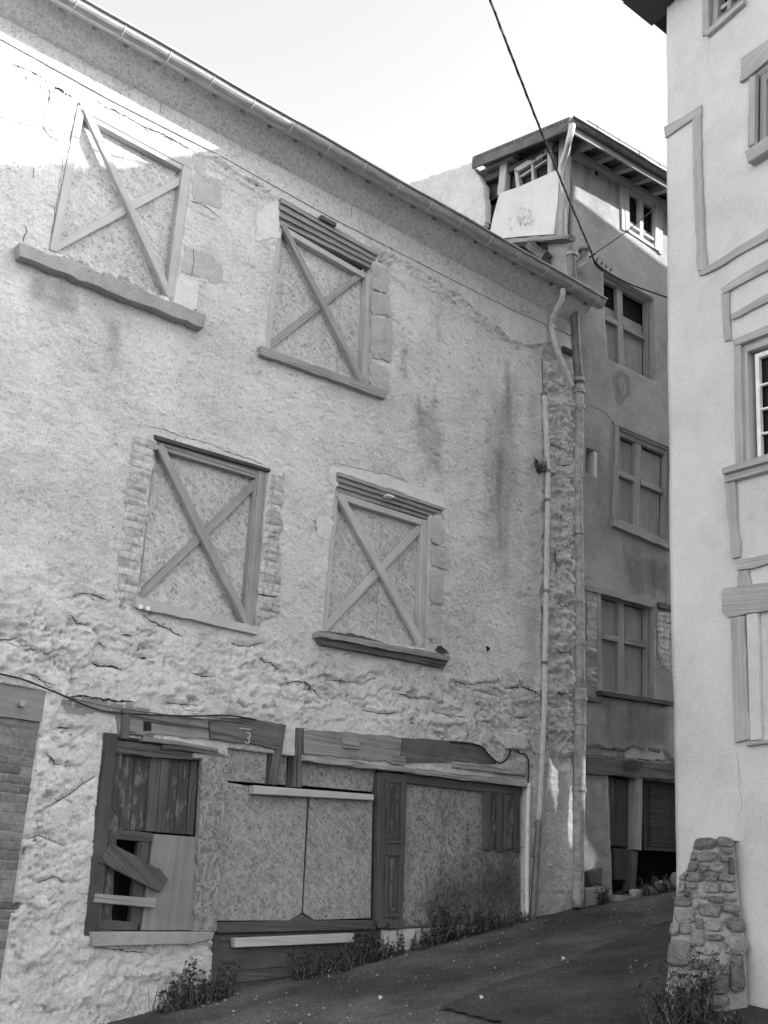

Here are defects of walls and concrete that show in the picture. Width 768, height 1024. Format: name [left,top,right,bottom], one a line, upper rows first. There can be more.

flaking render [181,245,224,284]
flaking render [116,437,158,603]
flaking render [255,471,286,627]
crack [71,593,180,670]
crack [0,638,133,702]
crack [230,642,353,697]
crack [364,693,463,720]
crack [454,681,572,719]
crack [46,753,95,806]